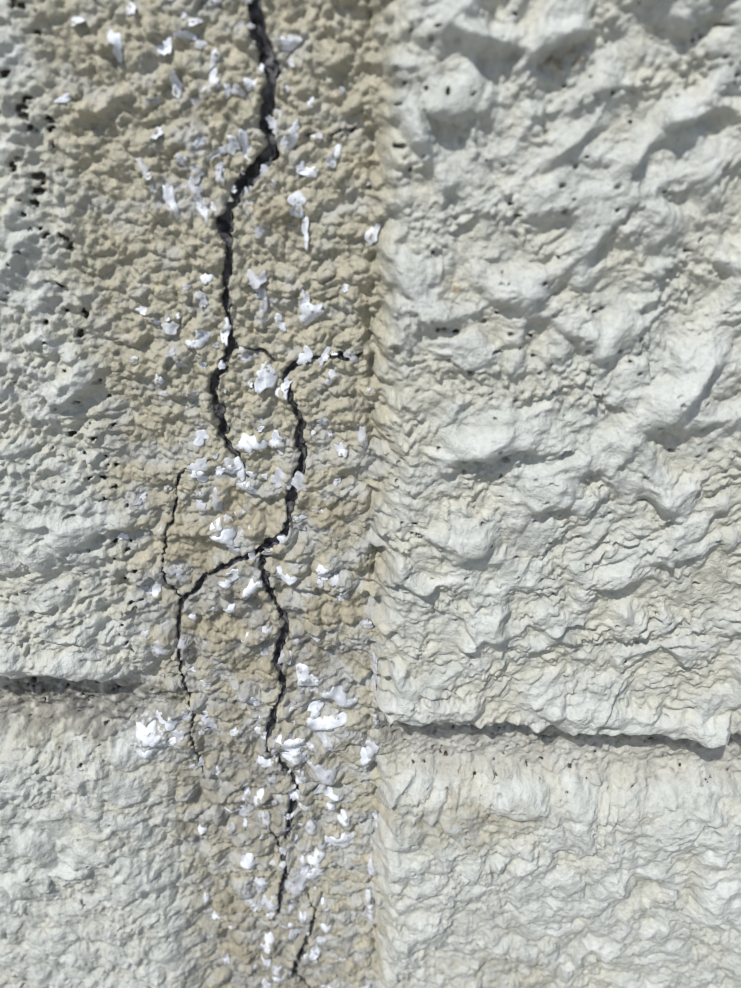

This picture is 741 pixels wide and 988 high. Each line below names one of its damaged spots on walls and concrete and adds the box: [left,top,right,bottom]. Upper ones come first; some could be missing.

crack [161,0,363,988]